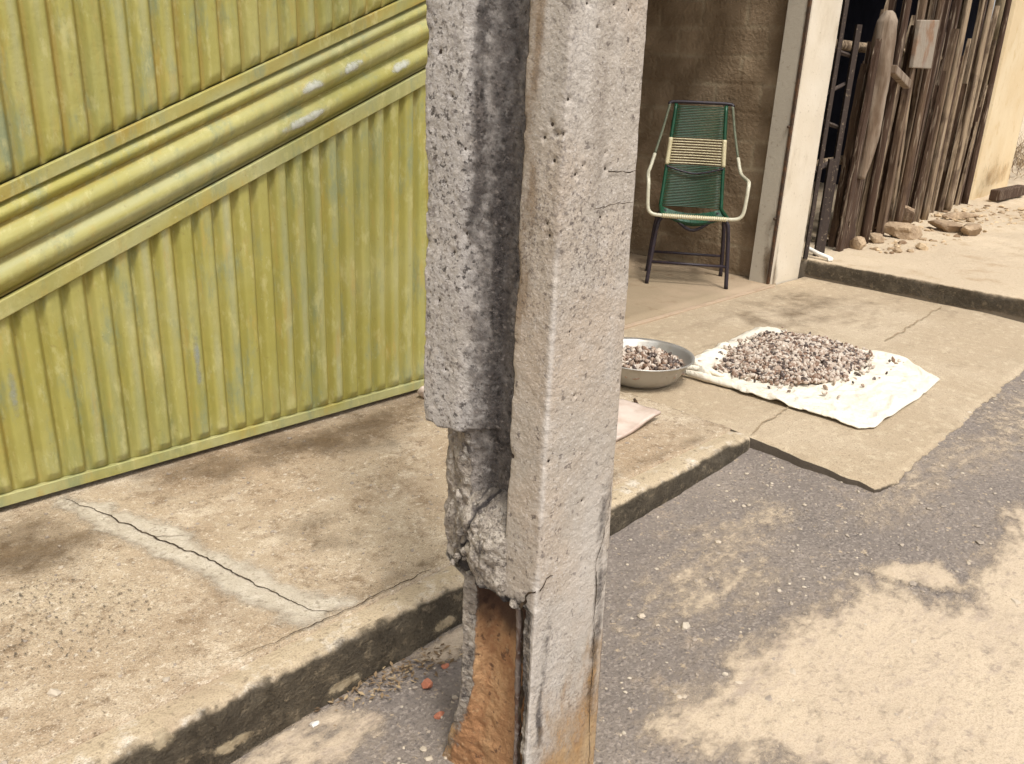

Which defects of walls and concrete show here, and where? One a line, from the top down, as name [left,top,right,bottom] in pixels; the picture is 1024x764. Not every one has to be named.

damp [469,0,531,492]
crack [64,498,429,662]
spalling [427,420,478,743]
corrosion [442,586,526,764]
spalling [509,598,532,764]